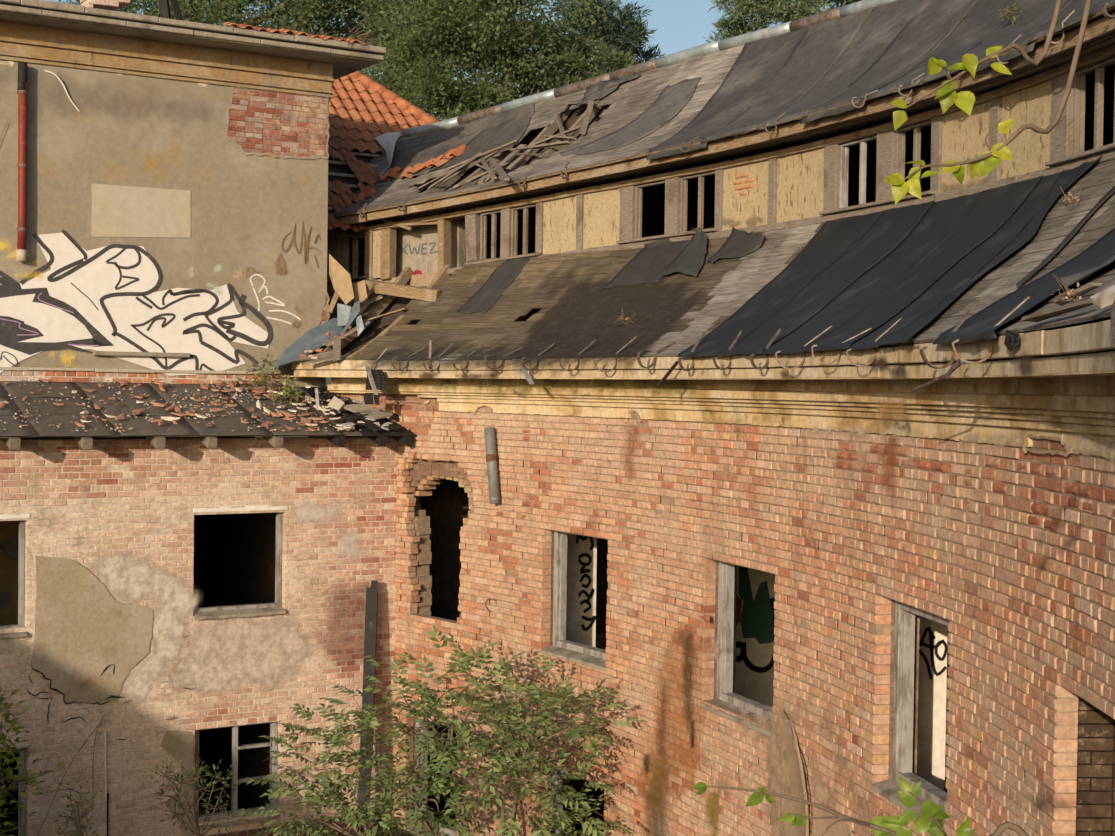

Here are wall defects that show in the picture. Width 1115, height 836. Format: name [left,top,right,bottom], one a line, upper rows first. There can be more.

flaking render [225,86,330,161]
water stain [520,381,626,393]
water stain [651,380,695,394]
spalling [403,452,475,531]
water stain [707,792,719,829]